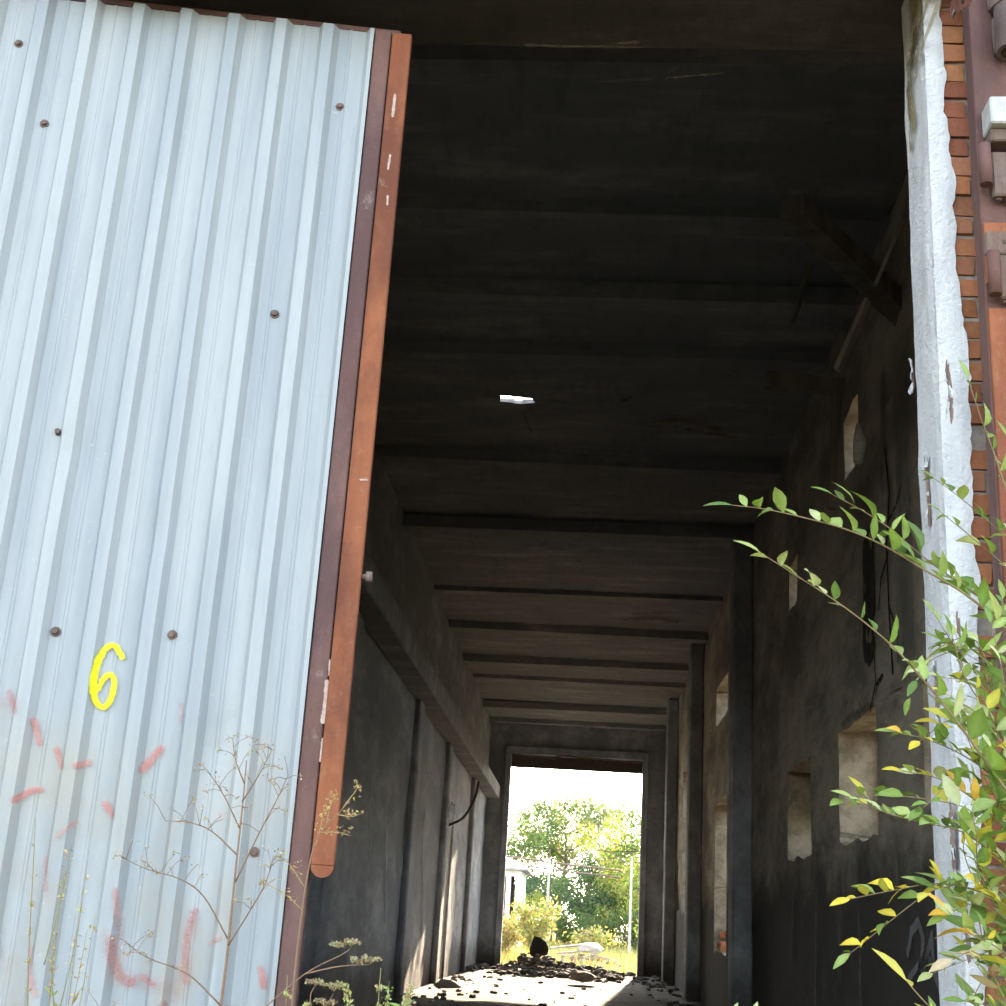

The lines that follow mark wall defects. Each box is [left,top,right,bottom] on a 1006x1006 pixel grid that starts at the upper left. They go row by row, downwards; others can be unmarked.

water stain [907,0,940,151]